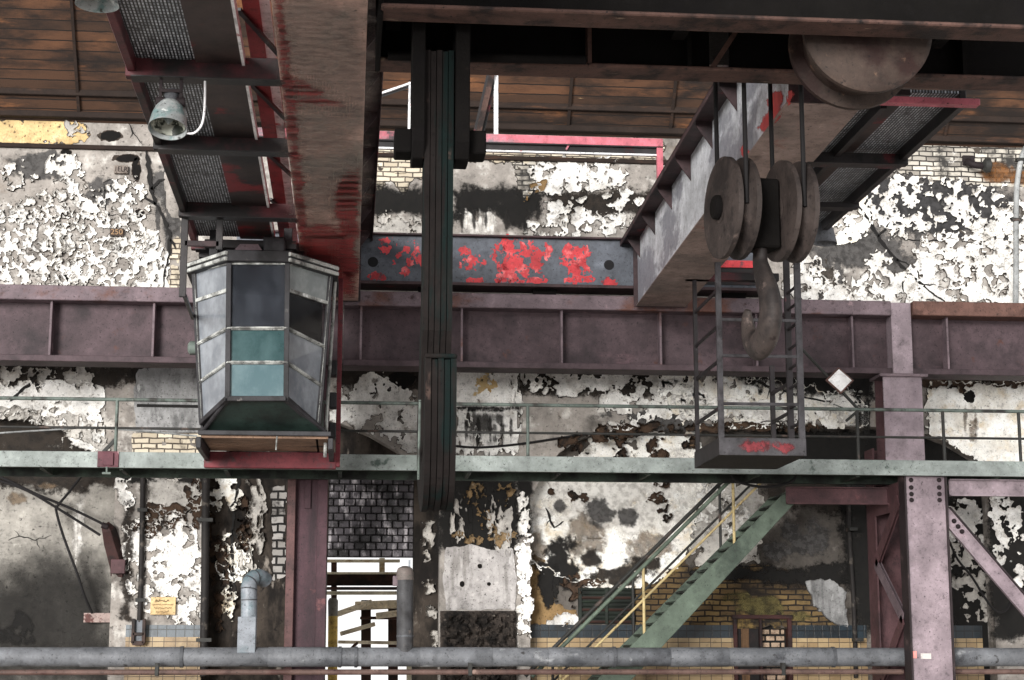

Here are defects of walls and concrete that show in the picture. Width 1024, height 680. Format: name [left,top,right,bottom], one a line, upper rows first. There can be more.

peeling [0,120,181,288]
damp [374,183,422,218]
flaking render [376,150,422,193]
damp [453,183,651,234]
peeling [469,142,666,237]
peeling [781,145,1024,303]
peeling [0,366,114,452]
peeling [456,372,869,458]
peeling [113,478,287,633]
damp [433,481,698,610]
spalling [420,481,765,648]
peeling [948,497,1024,588]